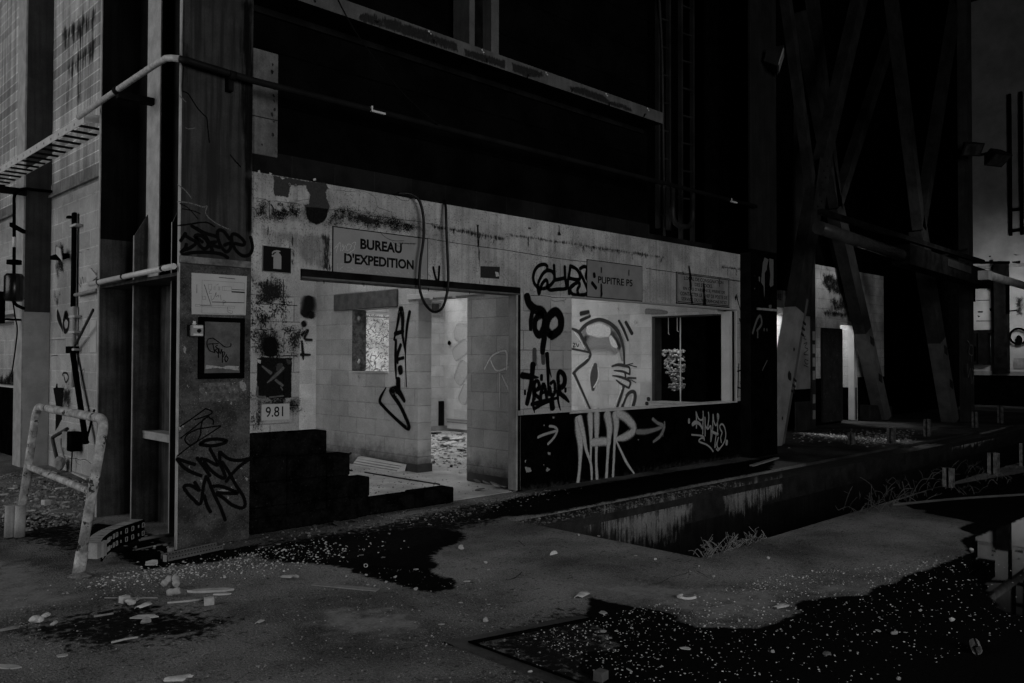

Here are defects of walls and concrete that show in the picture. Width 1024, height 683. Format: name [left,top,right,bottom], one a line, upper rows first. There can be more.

water stain [63,9,96,106]
water stain [322,206,663,271]
water stain [251,276,307,360]